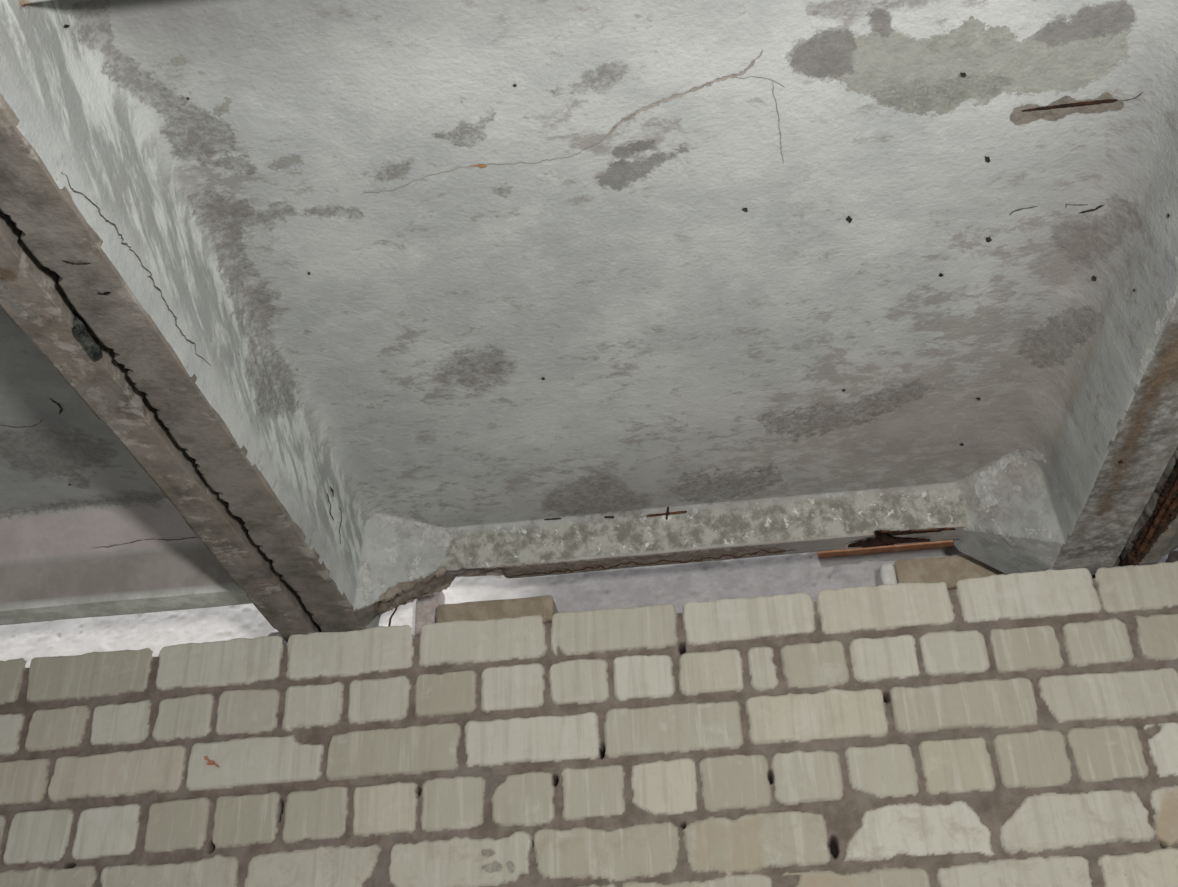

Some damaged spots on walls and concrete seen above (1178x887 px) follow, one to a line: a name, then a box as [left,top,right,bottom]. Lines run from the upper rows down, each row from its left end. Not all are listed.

crack [361,50,784,195]
leakage [597,140,688,190]
leakage [786,0,1135,118]
spalling [1010,92,1143,125]
crack [61,172,211,366]
crack [1,398,63,428]